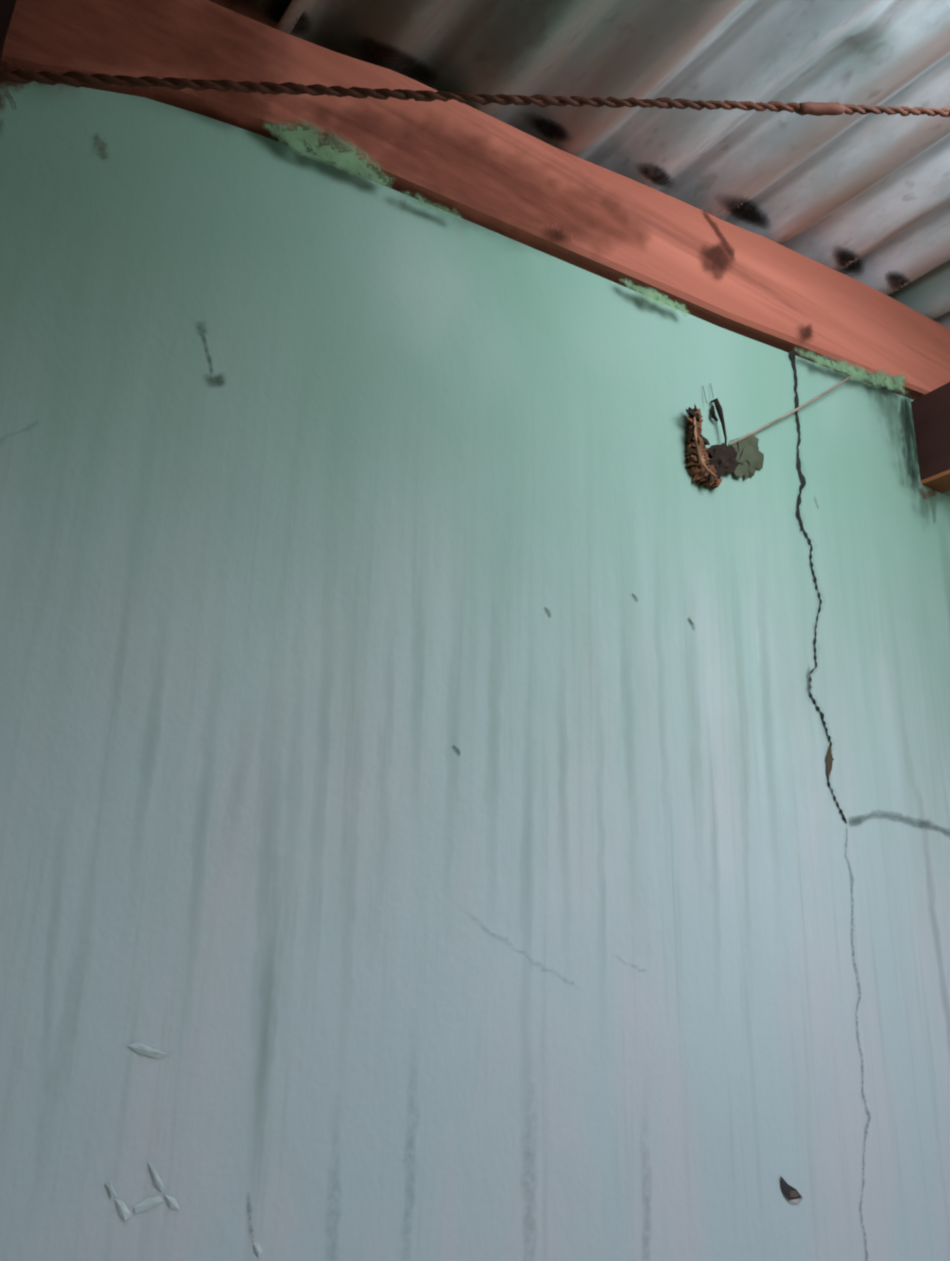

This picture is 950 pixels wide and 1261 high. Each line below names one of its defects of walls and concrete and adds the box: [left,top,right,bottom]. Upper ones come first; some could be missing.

crack [789,350,847,823]